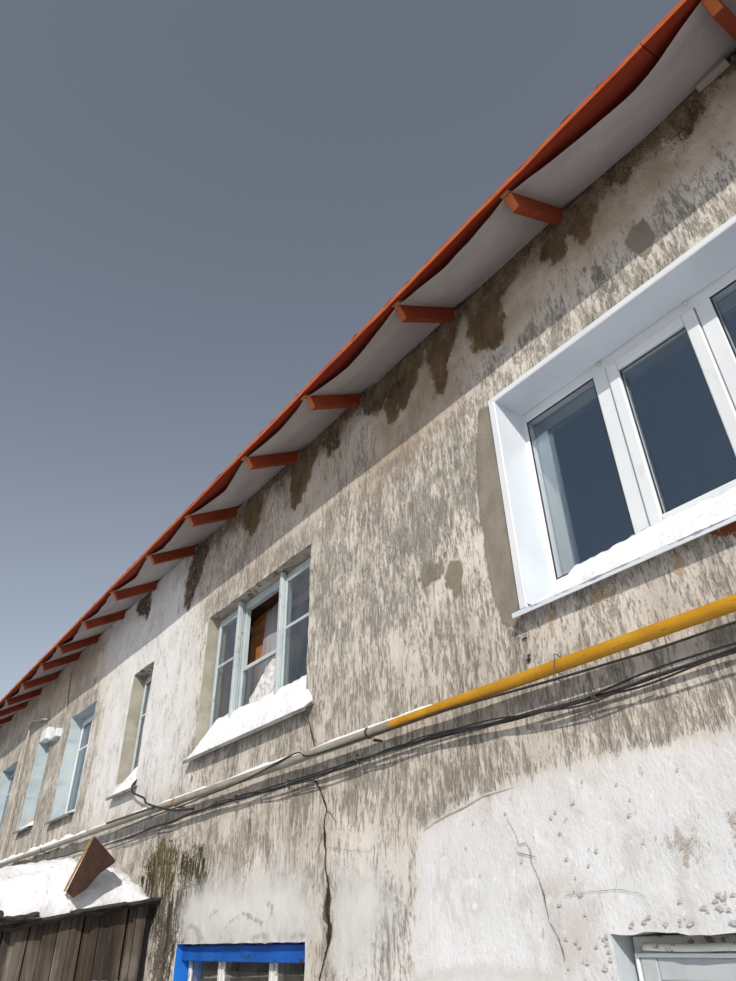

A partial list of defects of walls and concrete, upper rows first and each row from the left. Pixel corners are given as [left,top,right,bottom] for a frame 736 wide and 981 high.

water stain [183,53,736,611]
flaking render [709,521,736,538]
water stain [140,844,209,981]
crack [314,780,373,981]